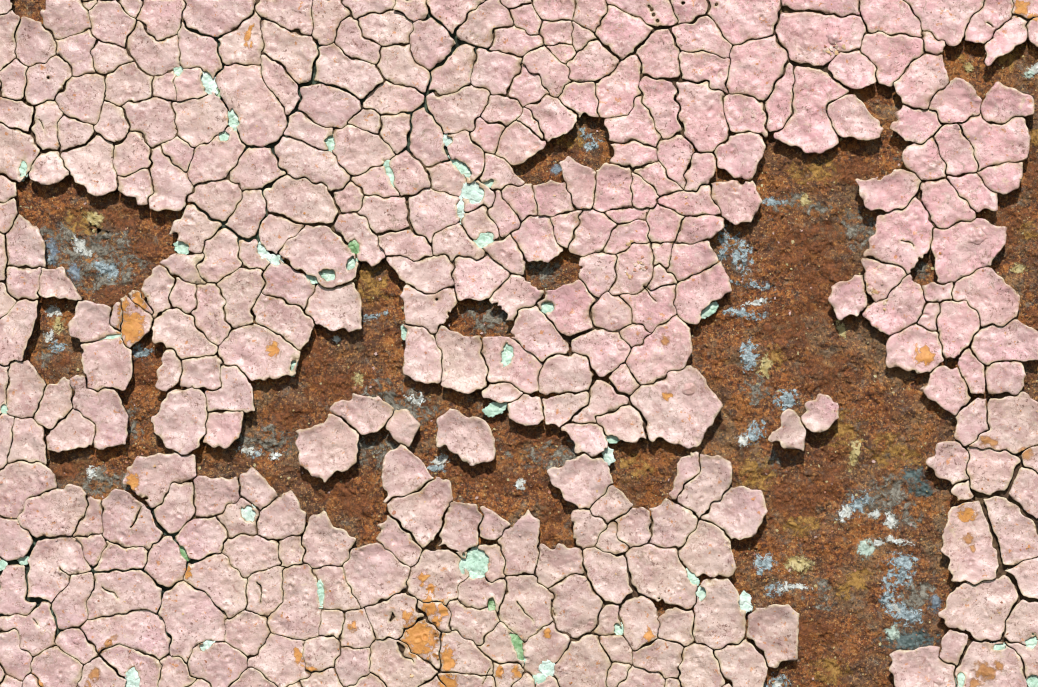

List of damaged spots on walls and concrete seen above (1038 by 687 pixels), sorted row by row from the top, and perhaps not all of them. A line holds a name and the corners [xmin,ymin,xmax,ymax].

corrosion [4,167,193,391]
peeling [0,175,301,687]
crack [183,21,369,245]
corrosion [37,255,720,559]
peeling [247,135,799,687]
peeling [201,0,1038,519]
crack [591,0,716,146]
crack [759,6,874,123]
corrosion [677,75,1038,687]
peeling [889,496,1038,687]
corrosion [935,0,1038,331]
crack [951,450,1038,686]